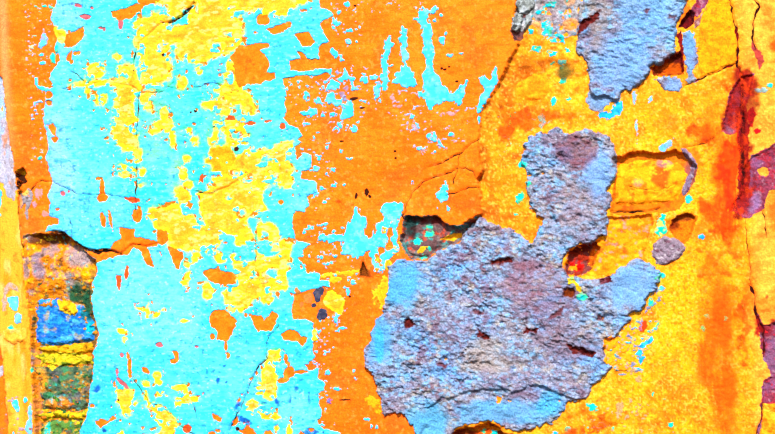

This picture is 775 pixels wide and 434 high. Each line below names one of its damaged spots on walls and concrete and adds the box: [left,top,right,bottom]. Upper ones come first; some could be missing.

crack [162,5,194,24]
peeling [510,0,737,113]
crack [55,222,143,255]
crack [18,82,235,250]
peeling [0,0,481,434]
crack [401,139,479,219]
peeling [353,116,698,434]
corrosion [687,124,711,144]
corrosion [699,67,759,259]
crack [738,90,746,188]
crack [743,211,767,357]
crack [214,325,279,434]